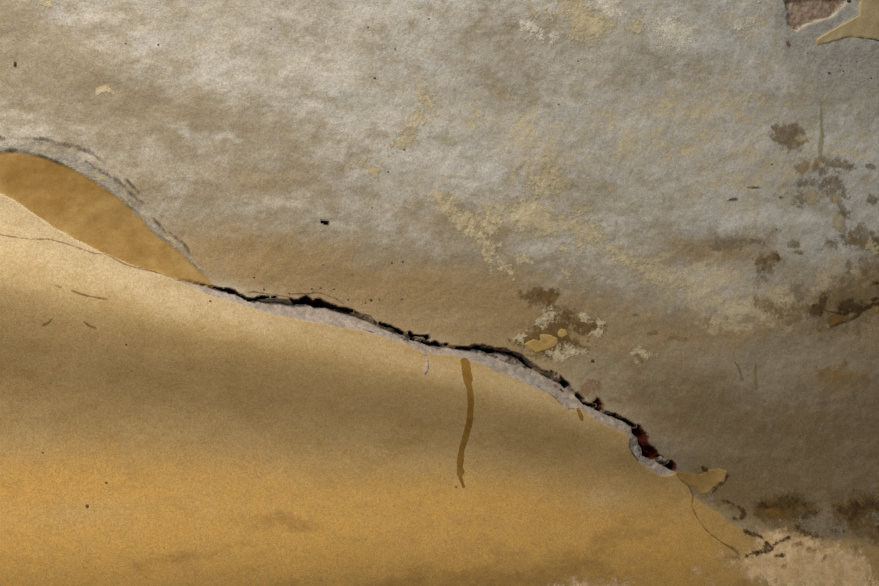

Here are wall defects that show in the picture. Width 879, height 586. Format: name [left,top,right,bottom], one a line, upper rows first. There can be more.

flaking render [775,0,879,47]
peeling [0,136,728,504]
crack [110,256,739,555]
leakage [508,286,607,364]
leakage [709,101,879,335]